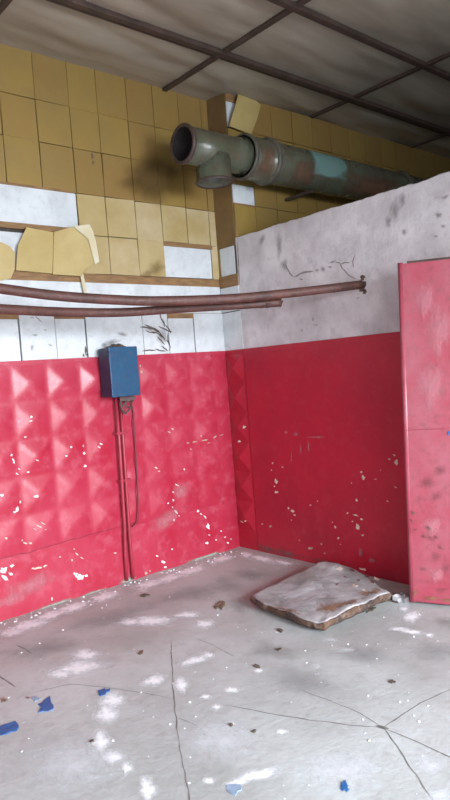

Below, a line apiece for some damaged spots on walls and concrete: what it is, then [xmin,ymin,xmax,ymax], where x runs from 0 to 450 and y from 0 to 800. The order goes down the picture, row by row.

corrosion [349,178,391,197]
crack [286,265,313,280]
crack [0,642,195,800]
crack [229,690,450,800]